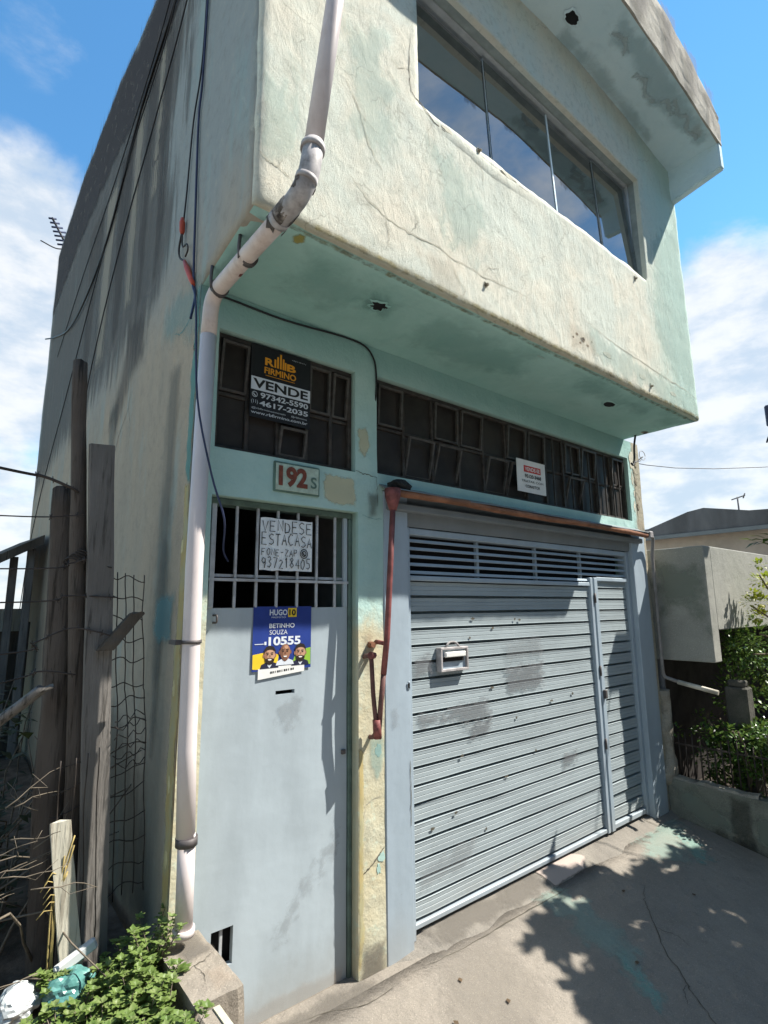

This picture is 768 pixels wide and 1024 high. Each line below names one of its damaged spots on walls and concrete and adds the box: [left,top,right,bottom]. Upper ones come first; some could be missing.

crack [392,46,453,145]
crack [501,170,525,190]
leakage [34,0,190,495]
crack [352,177,528,298]
hole [367,299,391,312]
peeling [324,475,355,504]
crack [643,888,716,1024]